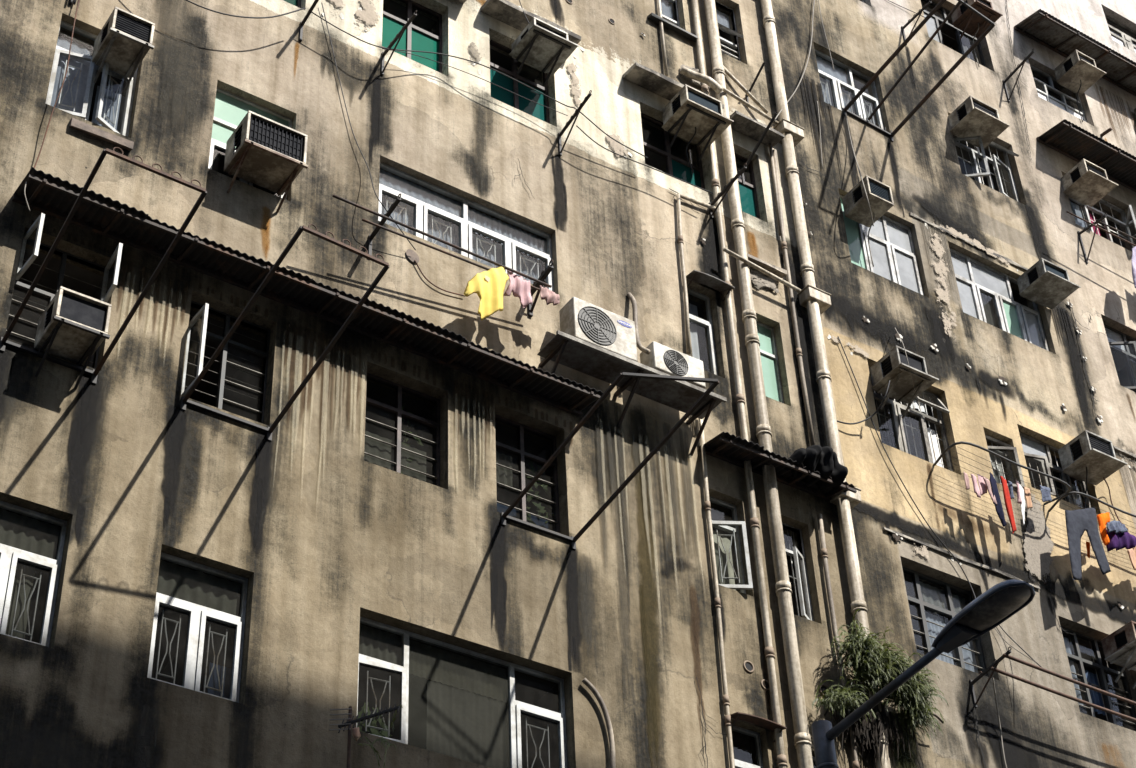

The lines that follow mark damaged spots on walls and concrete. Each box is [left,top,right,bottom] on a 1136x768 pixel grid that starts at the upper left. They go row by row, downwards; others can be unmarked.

peeling [322,0,380,32]
water stain [825,296,954,357]
water stain [888,142,905,217]
peeling [925,222,1018,340]
water stain [1025,204,1051,262]
water stain [1051,306,1089,428]
water stain [68,373,102,544]
water stain [162,406,186,527]
water stain [249,434,272,553]
water stain [490,520,507,648]
water stain [567,546,581,671]
water stain [854,502,1136,626]